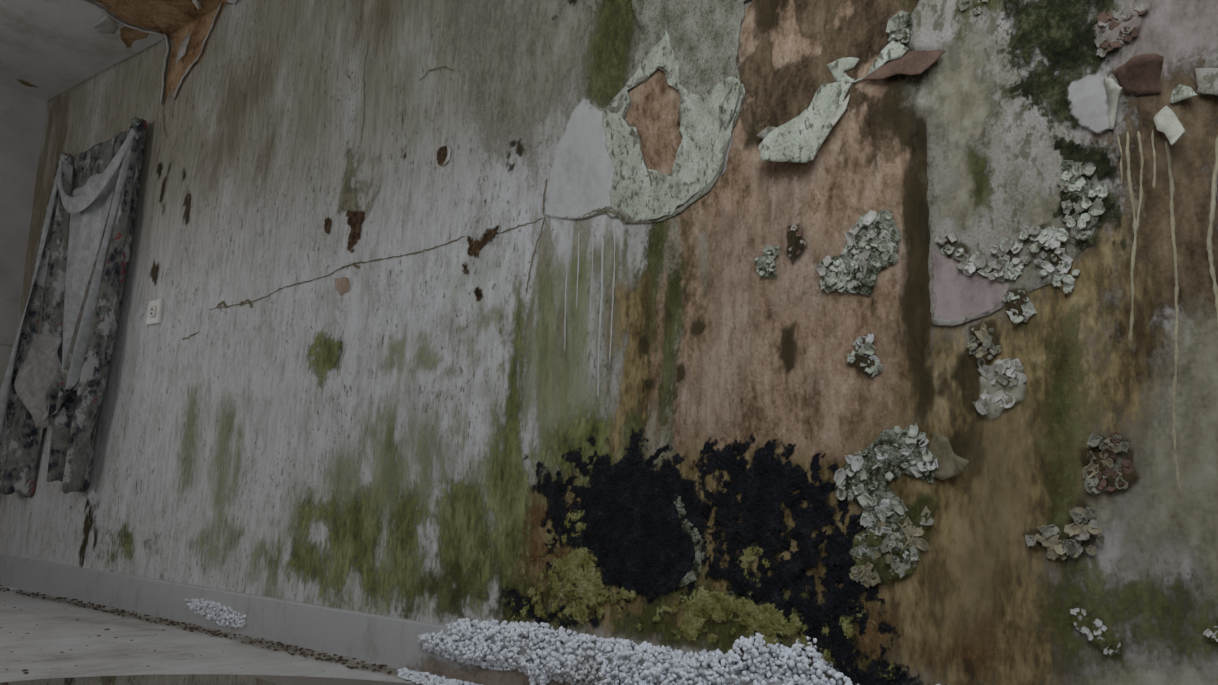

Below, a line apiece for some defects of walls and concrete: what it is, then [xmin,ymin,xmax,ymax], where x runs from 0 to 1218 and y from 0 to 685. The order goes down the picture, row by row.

spalling [77,0,237,137]
crack [182,236,465,340]
spalling [335,277,349,295]
peeling [324,150,380,253]
spalling [462,225,501,301]
spalling [507,139,524,171]
crack [499,177,548,294]
crack [579,209,627,223]
damp [406,0,1218,685]
flaking render [543,0,1218,588]
damp [184,598,246,629]